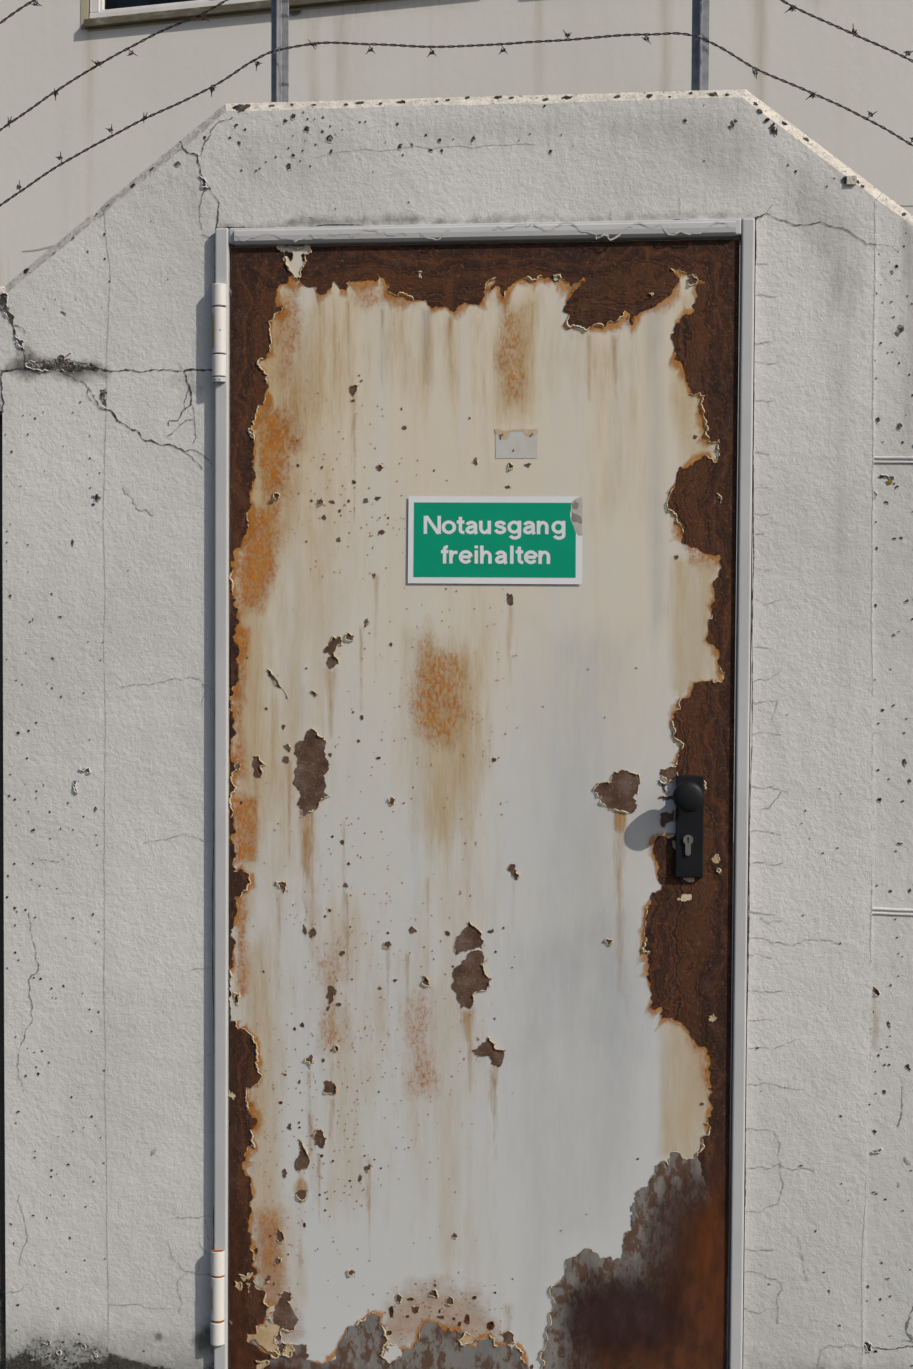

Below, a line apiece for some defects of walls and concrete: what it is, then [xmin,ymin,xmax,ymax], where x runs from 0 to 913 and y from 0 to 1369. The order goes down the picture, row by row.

spalling [0,292,105,373]
crack [0,294,213,469]
peeling [235,725,332,816]
corrosion [211,239,740,1369]
leakage [4,1341,170,1369]
crack [818,1310,913,1366]